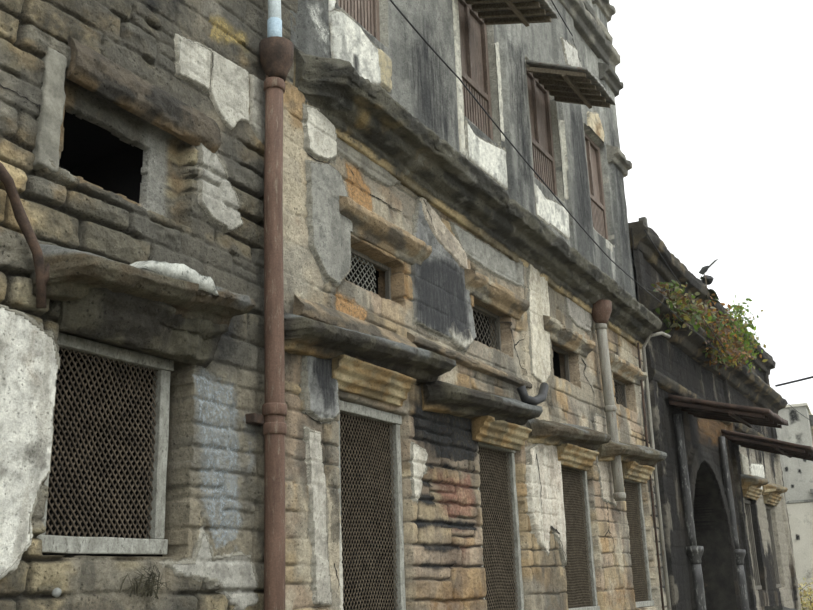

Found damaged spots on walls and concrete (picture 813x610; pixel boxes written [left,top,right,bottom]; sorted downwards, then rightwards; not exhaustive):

leakage [415,258,471,339]
peeling [525,443,567,568]